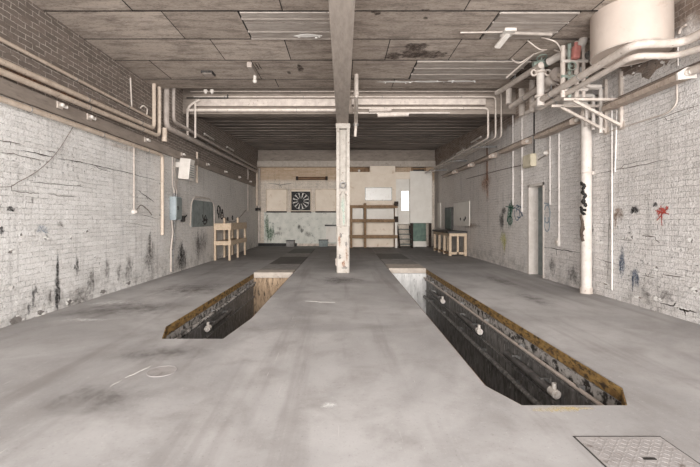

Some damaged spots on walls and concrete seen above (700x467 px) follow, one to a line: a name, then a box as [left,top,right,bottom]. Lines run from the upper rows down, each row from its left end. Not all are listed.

damp [386,43,447,59]
peeling [619,47,677,79]
crack [0,140,157,227]